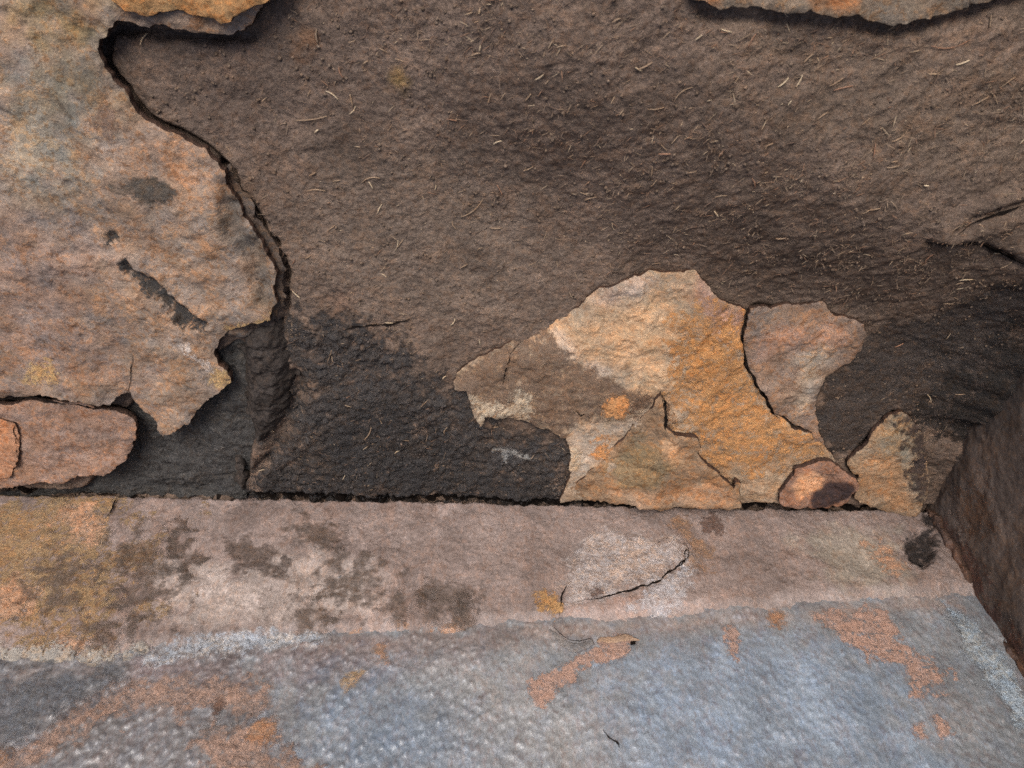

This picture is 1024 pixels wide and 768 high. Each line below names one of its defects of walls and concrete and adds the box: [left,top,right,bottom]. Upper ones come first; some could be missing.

spalling [97,12,284,322]
peeling [0,331,256,499]
water stain [245,303,583,507]
spalling [453,340,513,389]
crack [661,398,669,430]
spalling [572,268,922,478]
crack [740,312,779,418]
water stain [416,579,484,631]
crack [556,546,689,642]